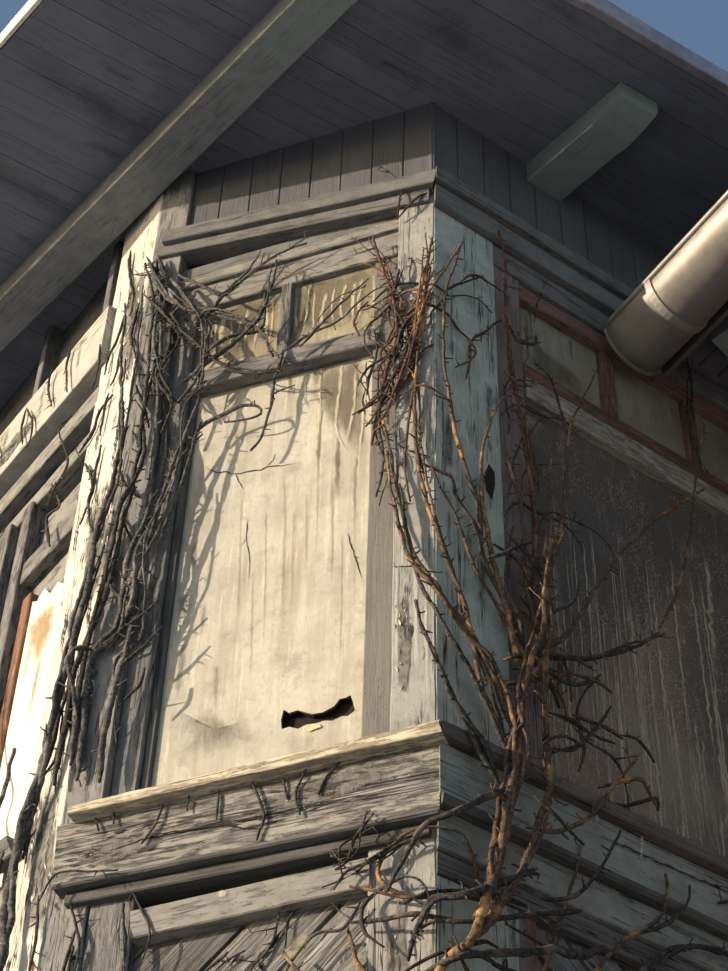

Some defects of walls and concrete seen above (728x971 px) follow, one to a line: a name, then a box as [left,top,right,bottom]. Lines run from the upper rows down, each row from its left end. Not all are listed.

water stain [210,299,274,354]
water stain [295,273,375,326]
water stain [305,360,364,482]
spalling [281,696,355,732]
water stain [547,539,728,857]